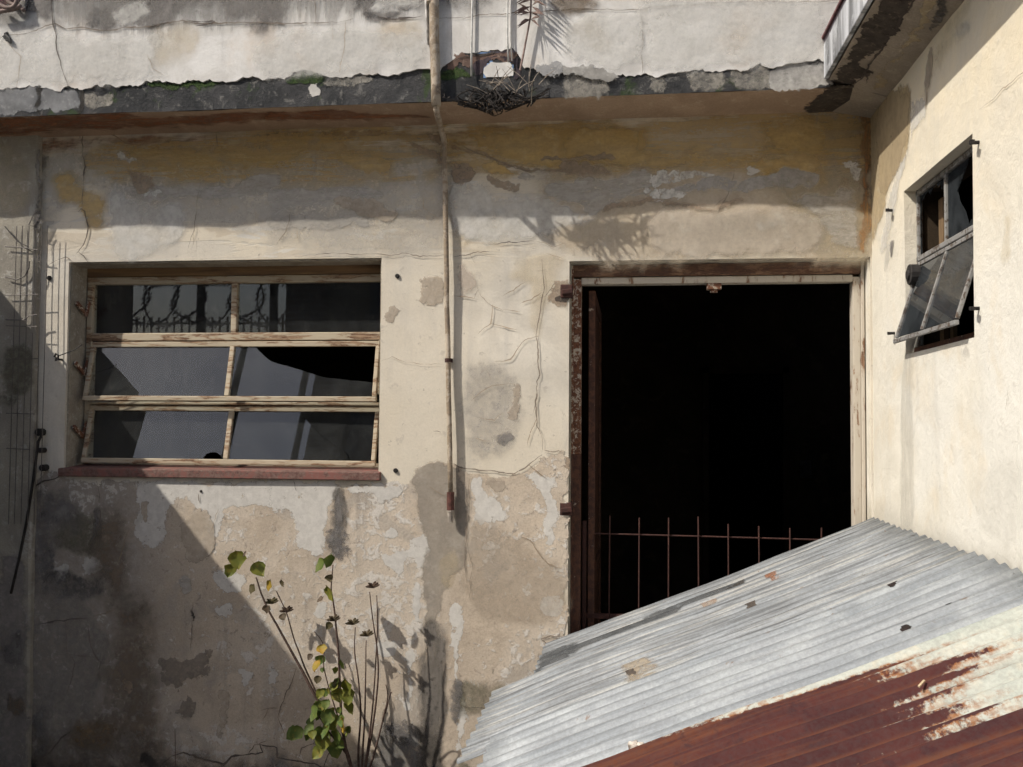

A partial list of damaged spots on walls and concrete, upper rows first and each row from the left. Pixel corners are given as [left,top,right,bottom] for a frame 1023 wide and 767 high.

peeling [0,85,113,116]
crack [8,0,353,88]
crack [379,0,833,72]
leakage [924,48,933,107]
crack [50,136,89,264]
peeling [603,196,743,211]
crack [279,187,570,597]
leakage [0,510,246,767]
peeling [32,450,570,767]
crack [161,669,349,767]
leakage [326,621,501,767]